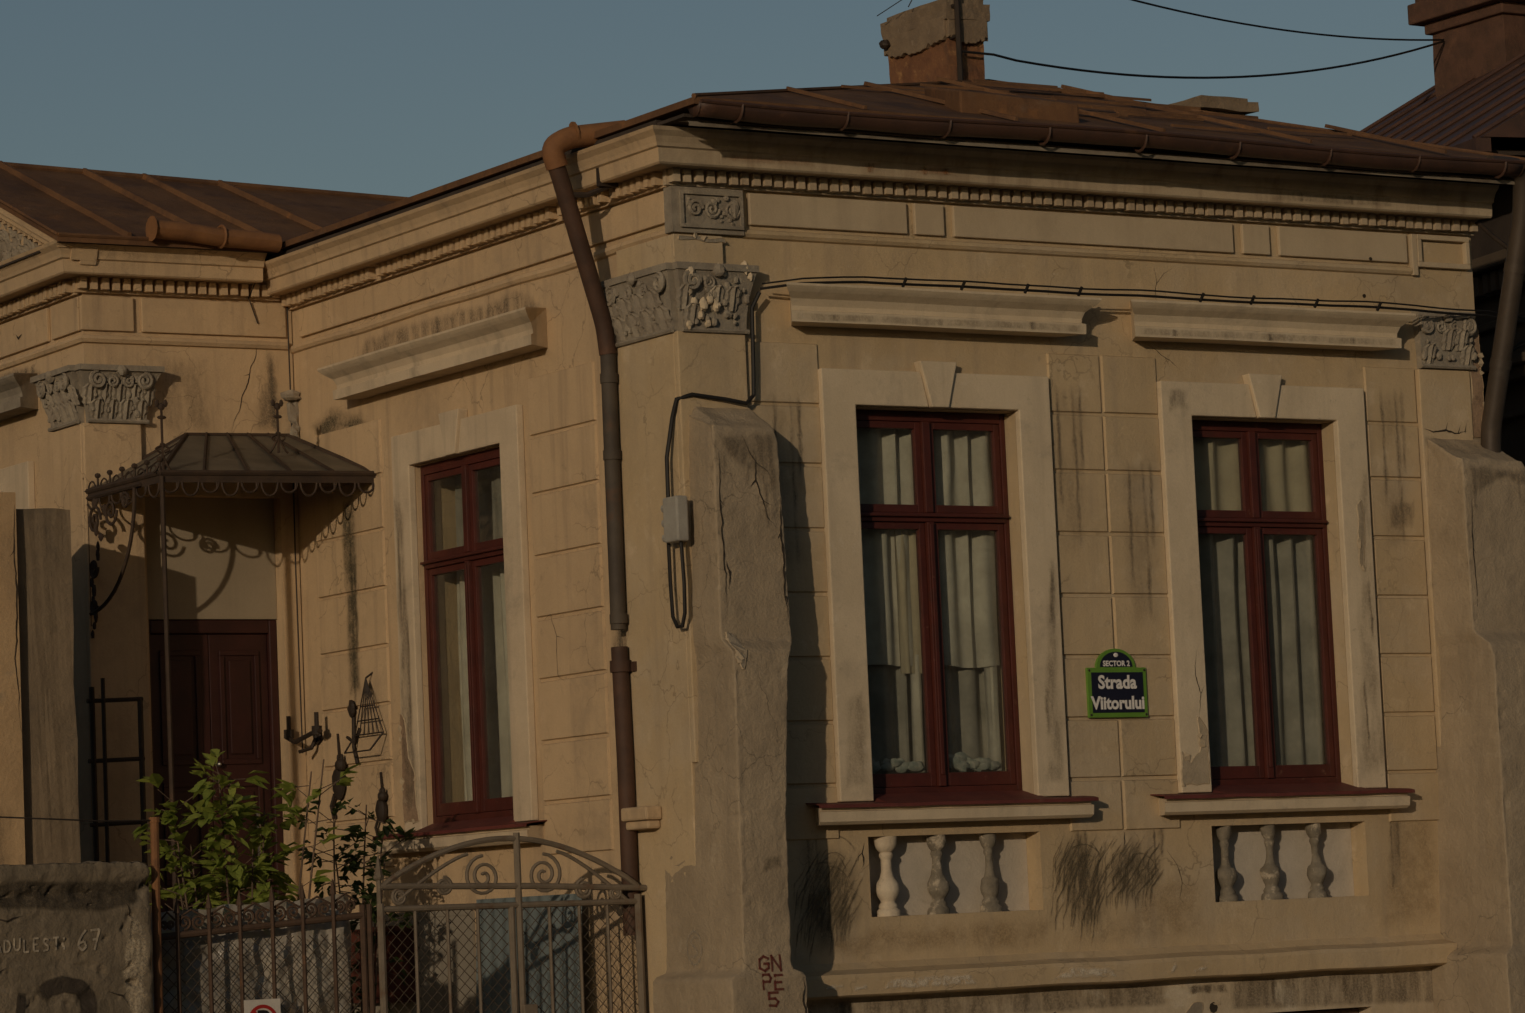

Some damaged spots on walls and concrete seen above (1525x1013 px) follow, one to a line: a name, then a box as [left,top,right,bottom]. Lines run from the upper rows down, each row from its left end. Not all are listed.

crack [232,349,257,428]
peeling [1180,717,1210,786]
water stain [1053,832,1163,934]
peeling [1185,1001,1220,1013]